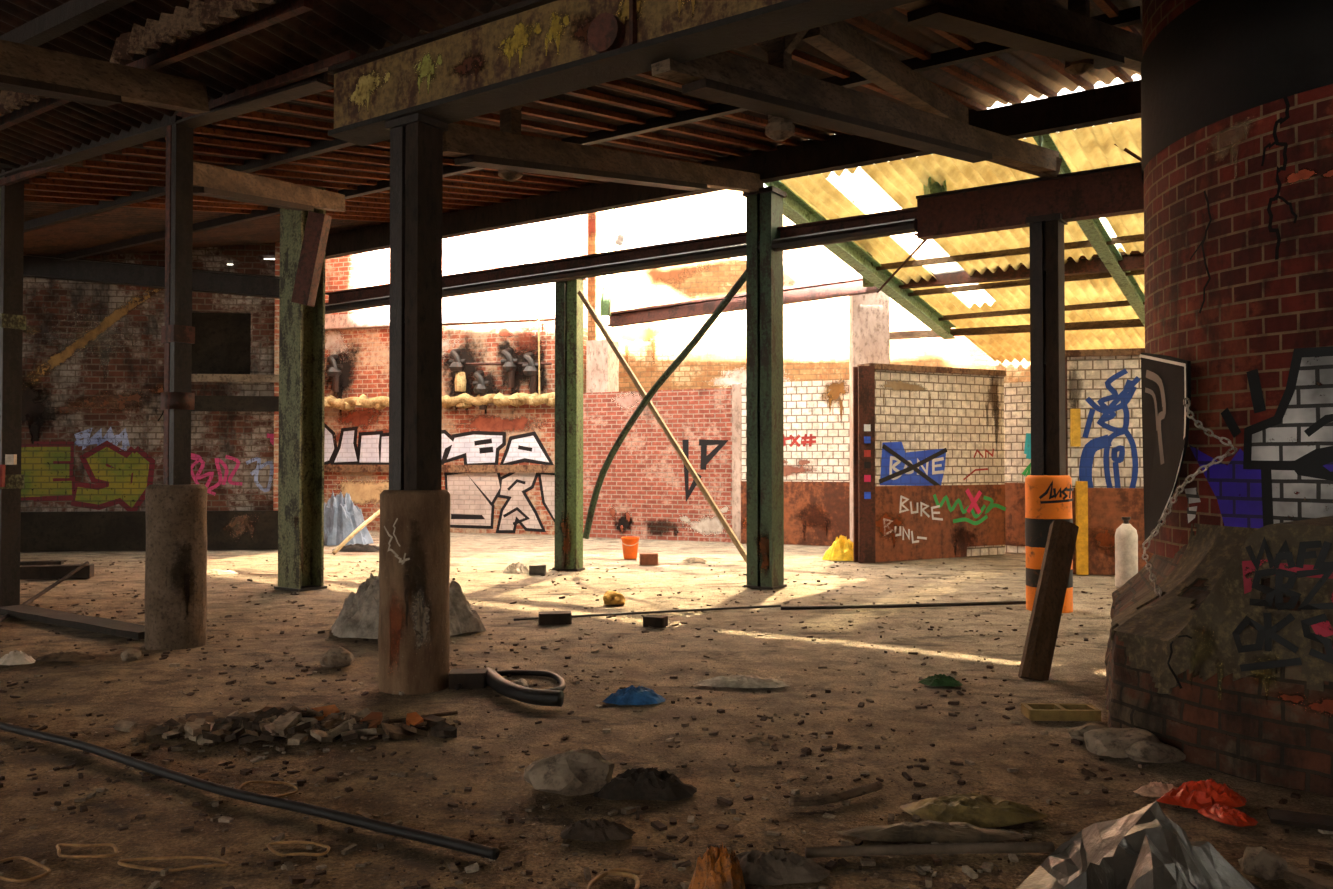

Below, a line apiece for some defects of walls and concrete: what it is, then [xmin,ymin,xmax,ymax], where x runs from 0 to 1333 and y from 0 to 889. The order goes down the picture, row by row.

corrosion [448,53,486,81]
corrosion [570,14,595,44]
crack [1261,97,1298,260]
corrosion [741,481,850,575]